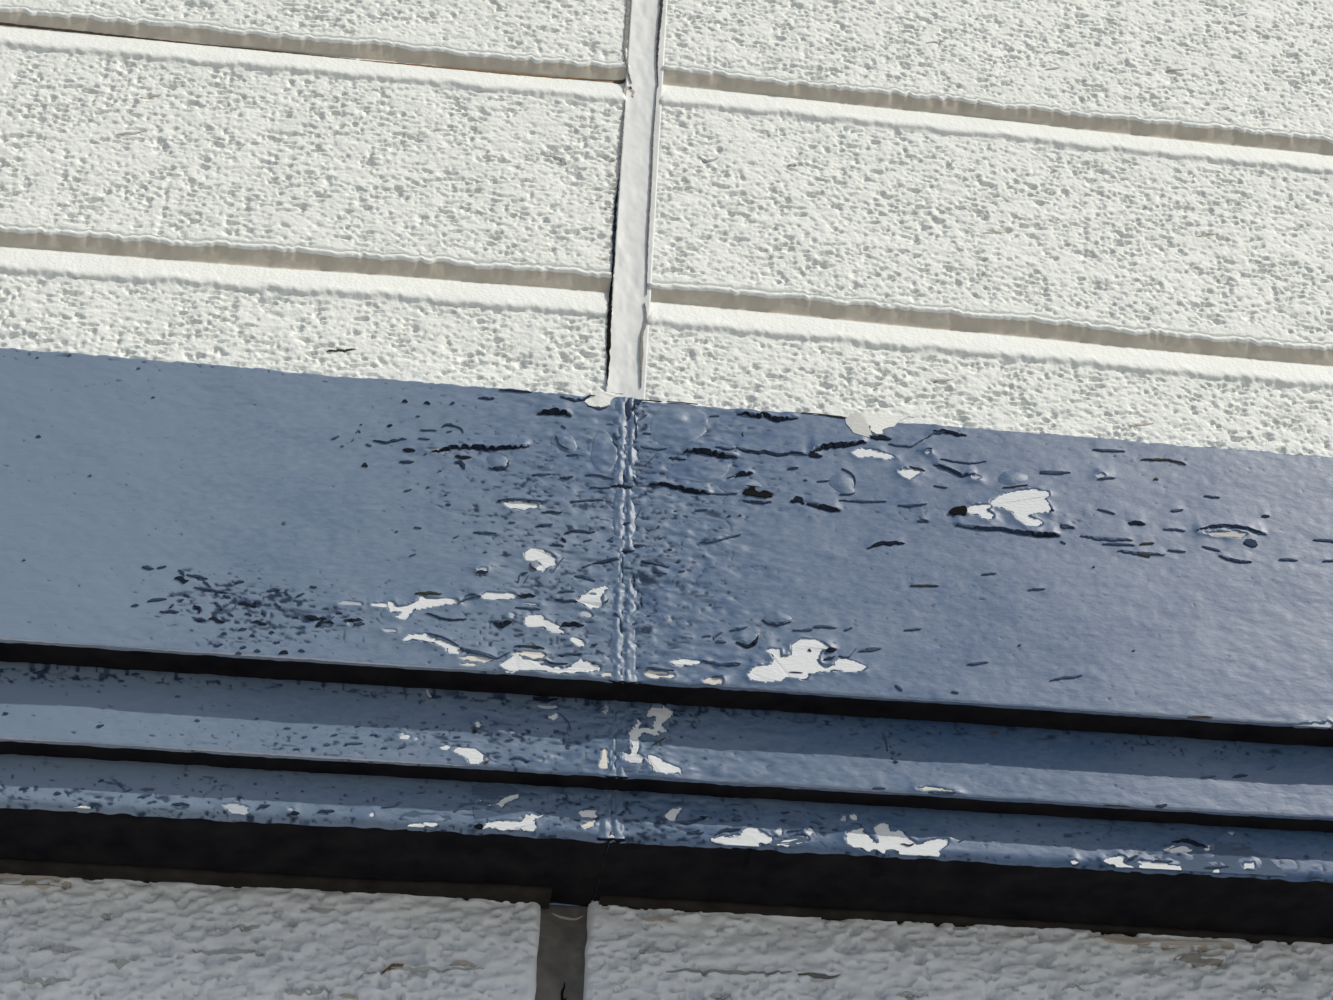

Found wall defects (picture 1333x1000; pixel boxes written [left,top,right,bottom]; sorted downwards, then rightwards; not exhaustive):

crack [331,0,1333,664]
peeling [967,489,1055,526]
peeling [131,565,612,677]
crack [647,619,922,678]
peeling [748,639,866,683]
crack [951,661,988,693]
crack [1050,674,1082,682]
crack [532,696,607,731]
peeling [600,705,694,775]
peeling [480,794,543,832]
peeling [841,814,948,857]
peeling [1104,846,1210,871]